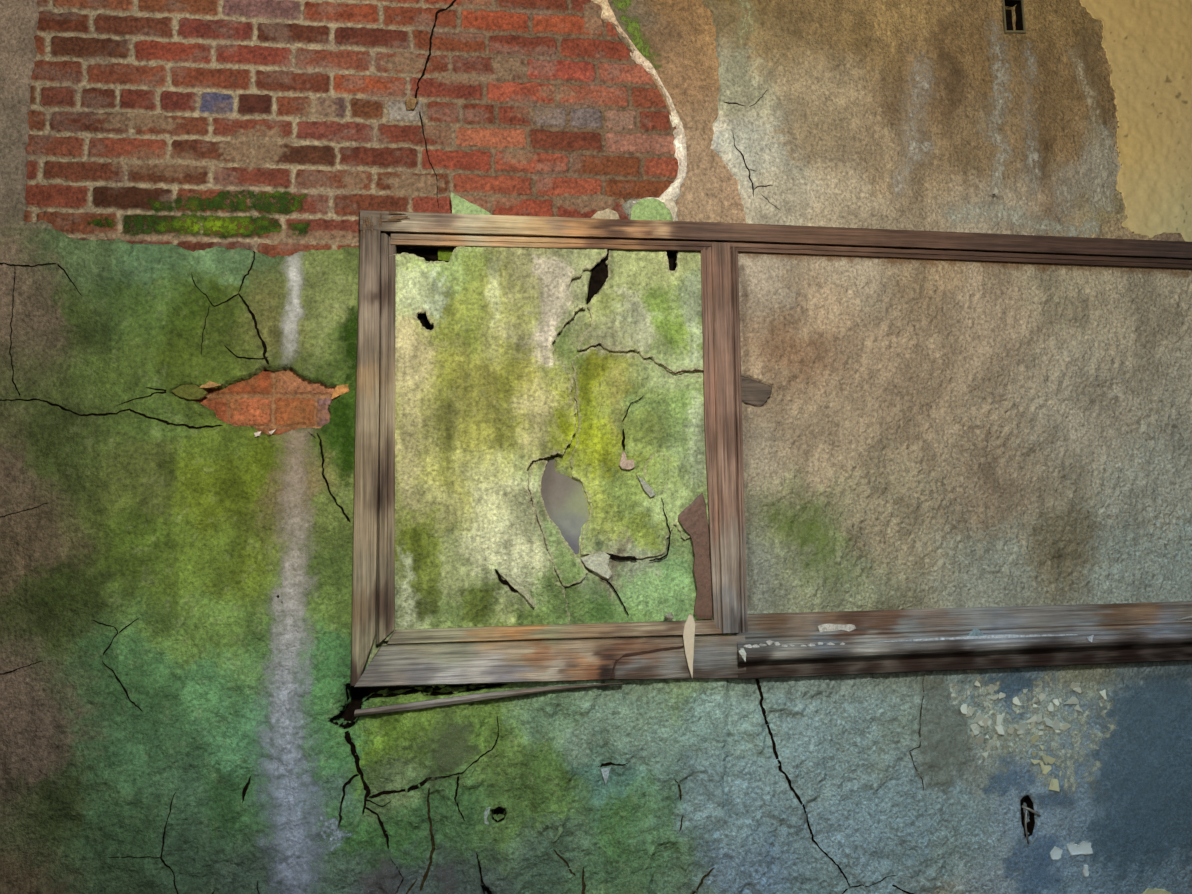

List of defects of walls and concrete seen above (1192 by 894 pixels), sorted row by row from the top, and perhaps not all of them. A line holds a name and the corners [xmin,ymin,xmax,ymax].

flaking render [23,0,746,257]
crack [415,0,456,209]
crack [0,262,223,429]
crack [191,249,269,364]
water stain [283,255,302,351]
flaking render [383,232,709,641]
water stain [260,429,351,894]
crack [338,716,499,894]
crack [692,867,715,894]
crack [755,679,914,894]
peeling [948,666,1115,794]
peeling [1050,841,1093,877]